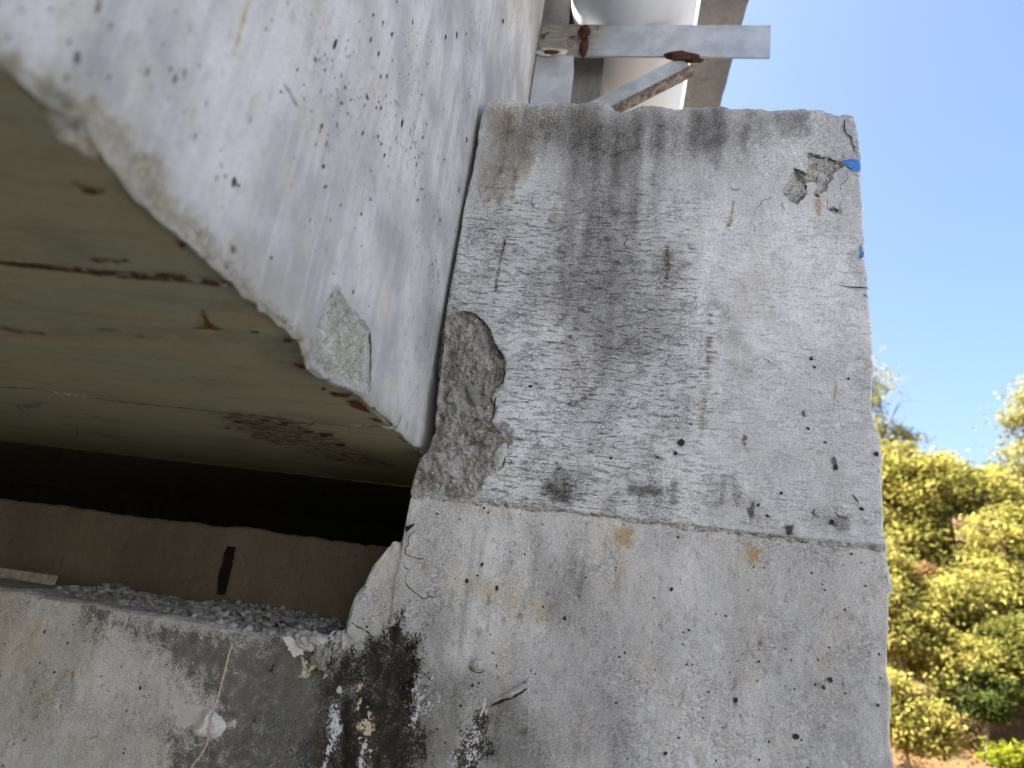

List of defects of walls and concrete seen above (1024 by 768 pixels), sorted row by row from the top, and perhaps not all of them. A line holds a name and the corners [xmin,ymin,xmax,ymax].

spalling [0,63,121,181]
spalling [783,152,844,214]
rust [73,258,188,282]
spalling [135,199,514,500]
crack [402,523,437,599]
damp [78,605,495,768]